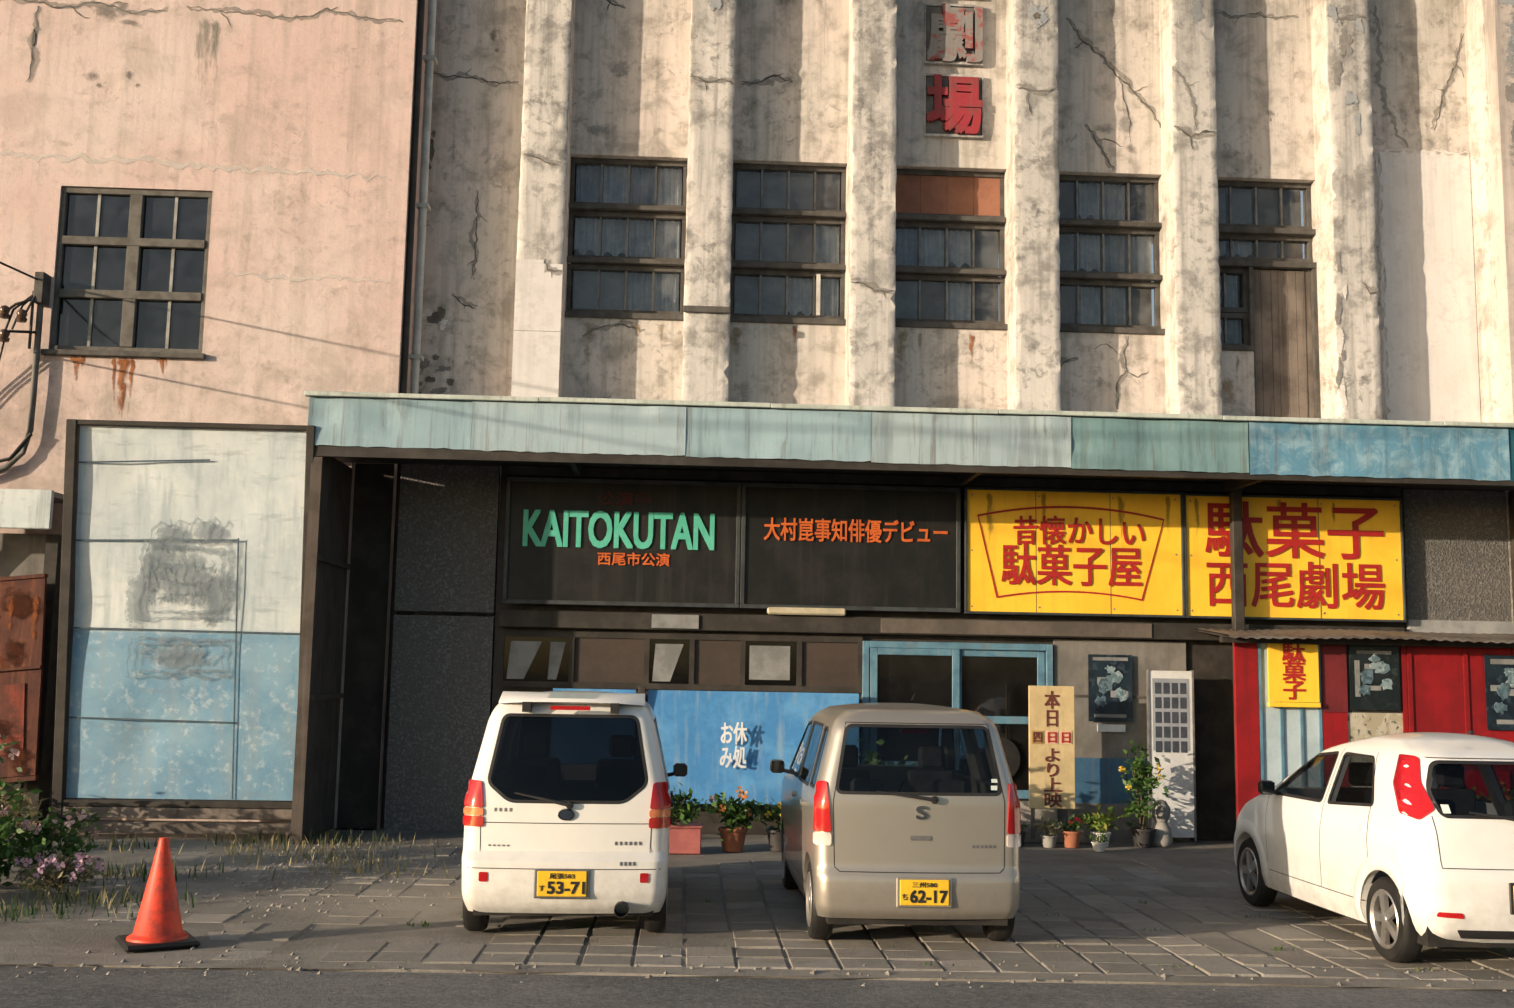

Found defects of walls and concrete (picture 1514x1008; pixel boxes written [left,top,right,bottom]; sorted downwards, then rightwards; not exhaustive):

crack [24,0,403,81]
crack [1067,18,1216,170]
crack [1219,10,1294,24]
crack [1338,5,1464,147]
peeling [1505,83,1514,142]
rust [111,358,135,409]
rust [2,590,44,666]